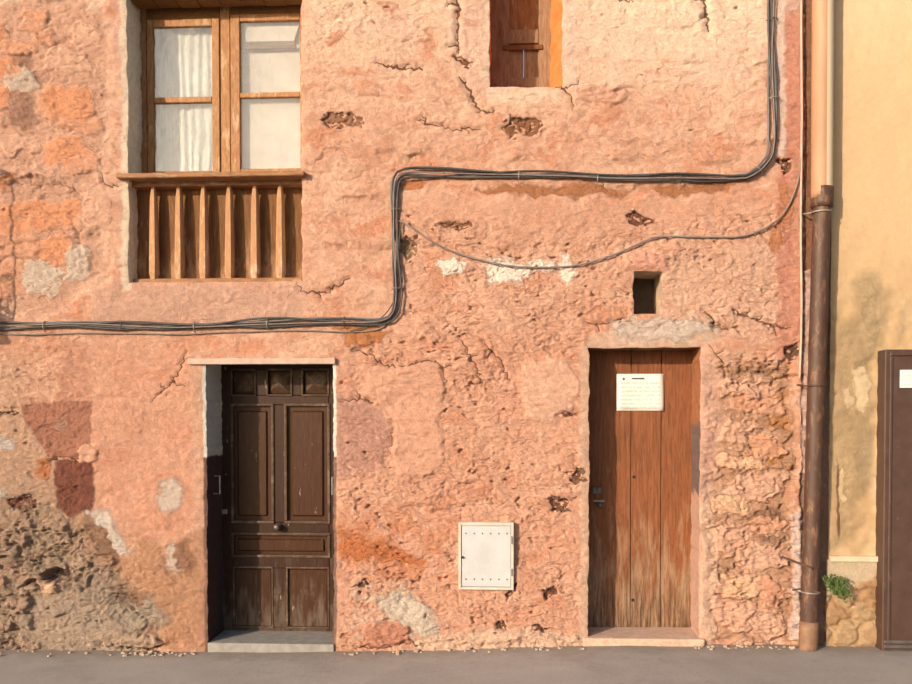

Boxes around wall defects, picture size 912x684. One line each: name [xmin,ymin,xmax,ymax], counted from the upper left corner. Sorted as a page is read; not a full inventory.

crack [447,0,461,54]
crack [695,0,710,33]
spalling [321,112,364,129]
crack [417,77,495,133]
spalling [502,115,543,140]
spalling [0,8,112,301]
spalling [626,208,654,227]
crack [152,352,187,401]
spalling [547,496,571,513]
spalling [0,494,117,651]